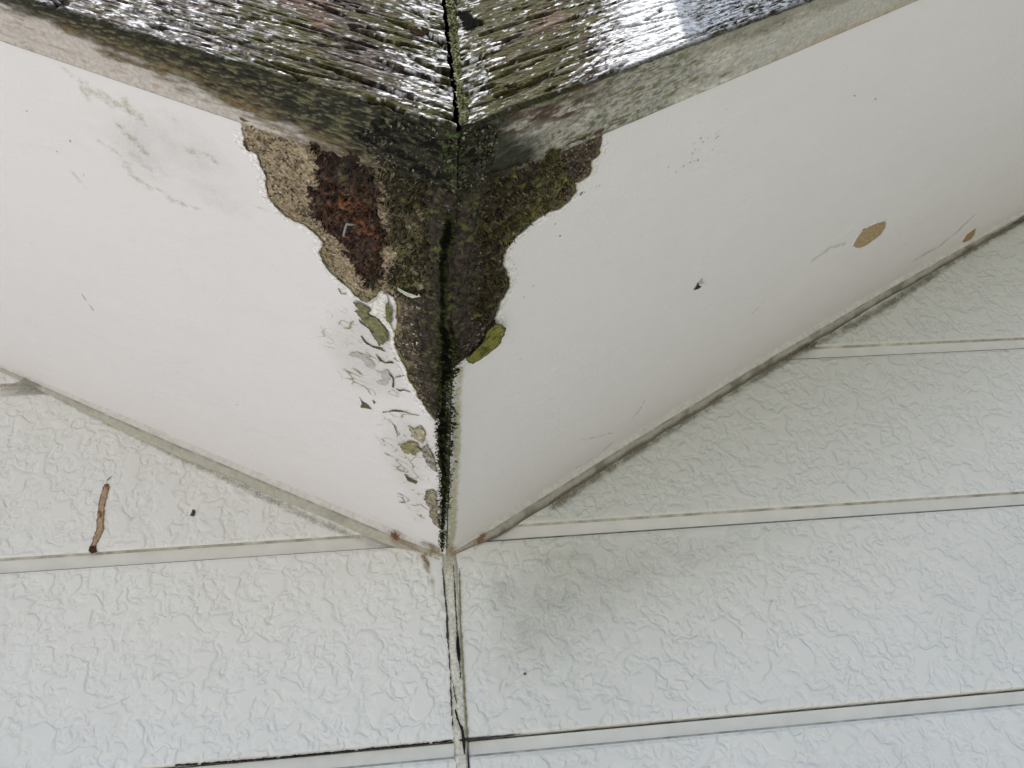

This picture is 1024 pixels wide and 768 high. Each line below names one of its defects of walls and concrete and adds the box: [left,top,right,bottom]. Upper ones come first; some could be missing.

peeling [851,219,887,249]
peeling [960,226,977,243]
peeling [232,117,610,529]